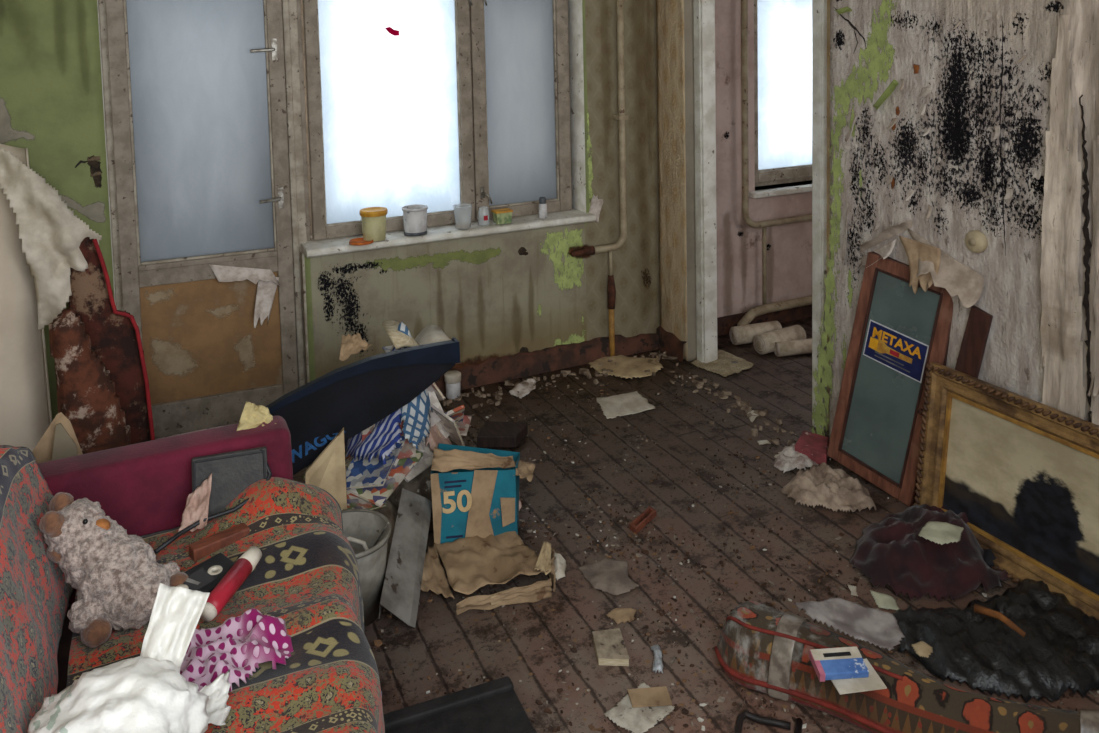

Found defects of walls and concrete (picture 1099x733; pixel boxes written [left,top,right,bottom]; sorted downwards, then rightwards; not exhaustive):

water stain [833,30,845,50]
water stain [1045,0,1064,13]
peeling [587,109,603,222]
water stain [845,10,1052,307]
peeling [367,248,501,271]
peeling [518,227,585,291]
peeling [1032,15,1099,425]
water stain [318,261,387,358]